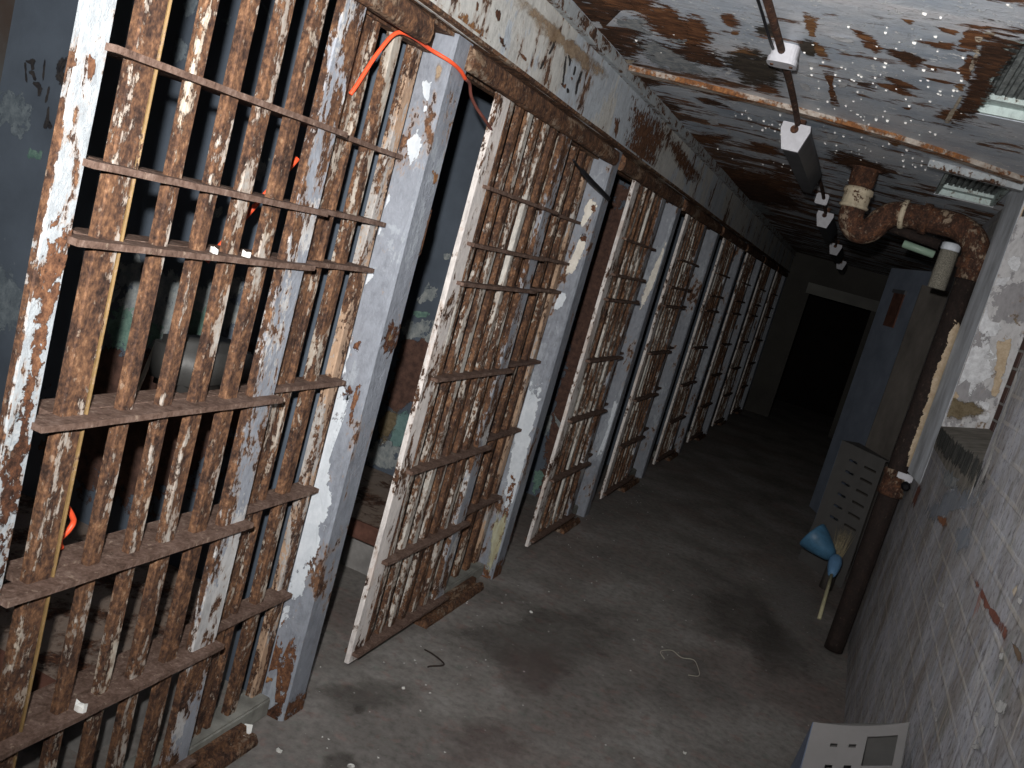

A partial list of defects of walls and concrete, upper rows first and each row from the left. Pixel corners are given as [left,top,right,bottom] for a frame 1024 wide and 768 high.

peeling [422,80,432,112]
peeling [810,27,911,125]
rust [851,18,1024,132]
peeling [407,129,422,165]
rust [0,213,73,578]
rust [92,342,125,395]
peeling [401,282,438,343]
rust [532,175,632,497]
peeling [936,305,1024,496]
rust [74,425,110,505]
rust [113,420,150,515]
peeling [279,335,353,628]